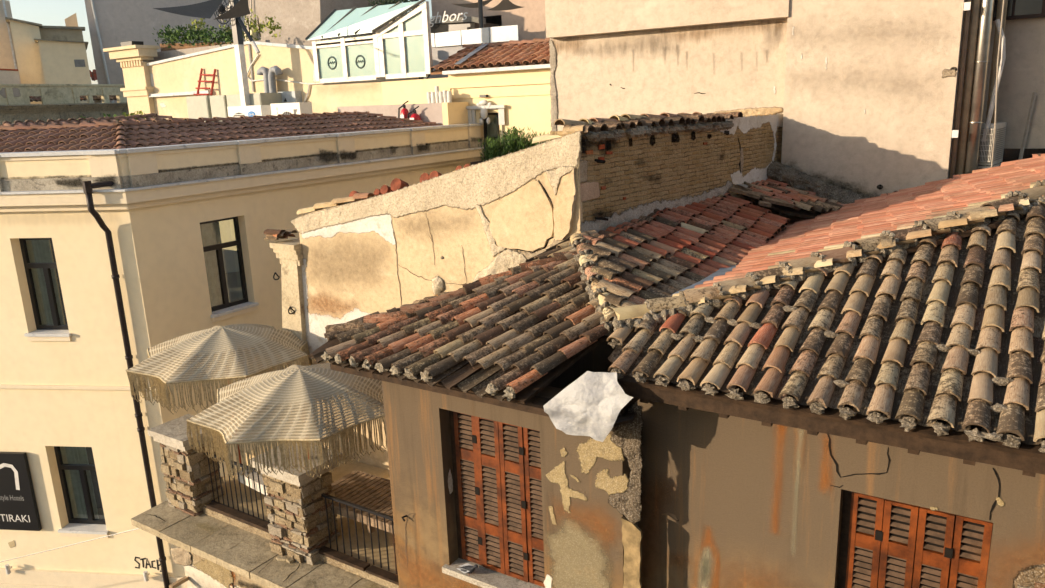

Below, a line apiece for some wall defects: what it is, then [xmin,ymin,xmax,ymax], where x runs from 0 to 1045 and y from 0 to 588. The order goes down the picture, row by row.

leakage [49,175,115,187]
leakage [158,163,239,173]
leakage [262,138,482,162]
spalling [263,40,581,282]
peeling [713,113,783,185]
crack [391,222,467,306]
crack [511,237,553,253]
crack [827,434,890,488]
peeling [544,404,644,588]
spalling [1012,565,1045,588]